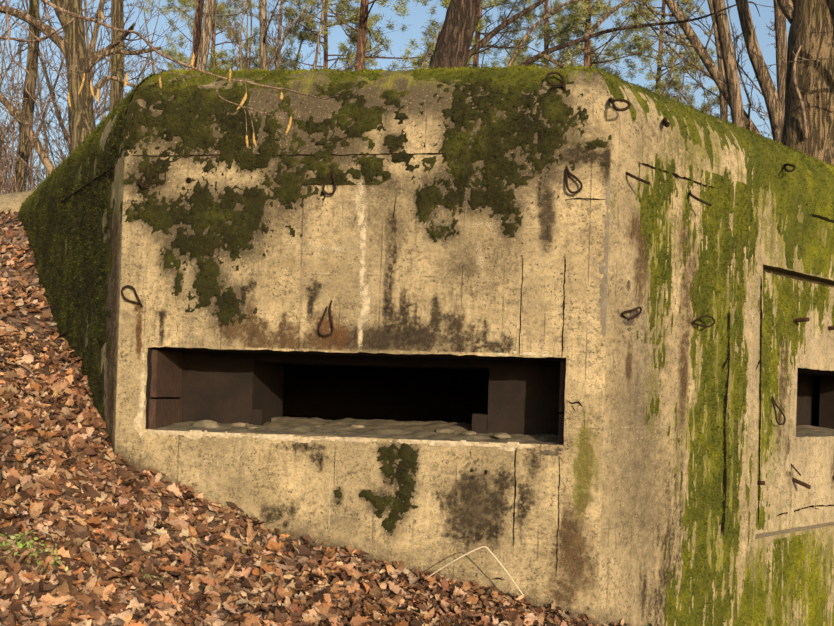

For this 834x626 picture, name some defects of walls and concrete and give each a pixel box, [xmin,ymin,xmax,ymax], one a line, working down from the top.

water stain [538,182,551,242]
water stain [346,182,513,353]
rust [220,305,352,349]
water stain [437,453,539,550]